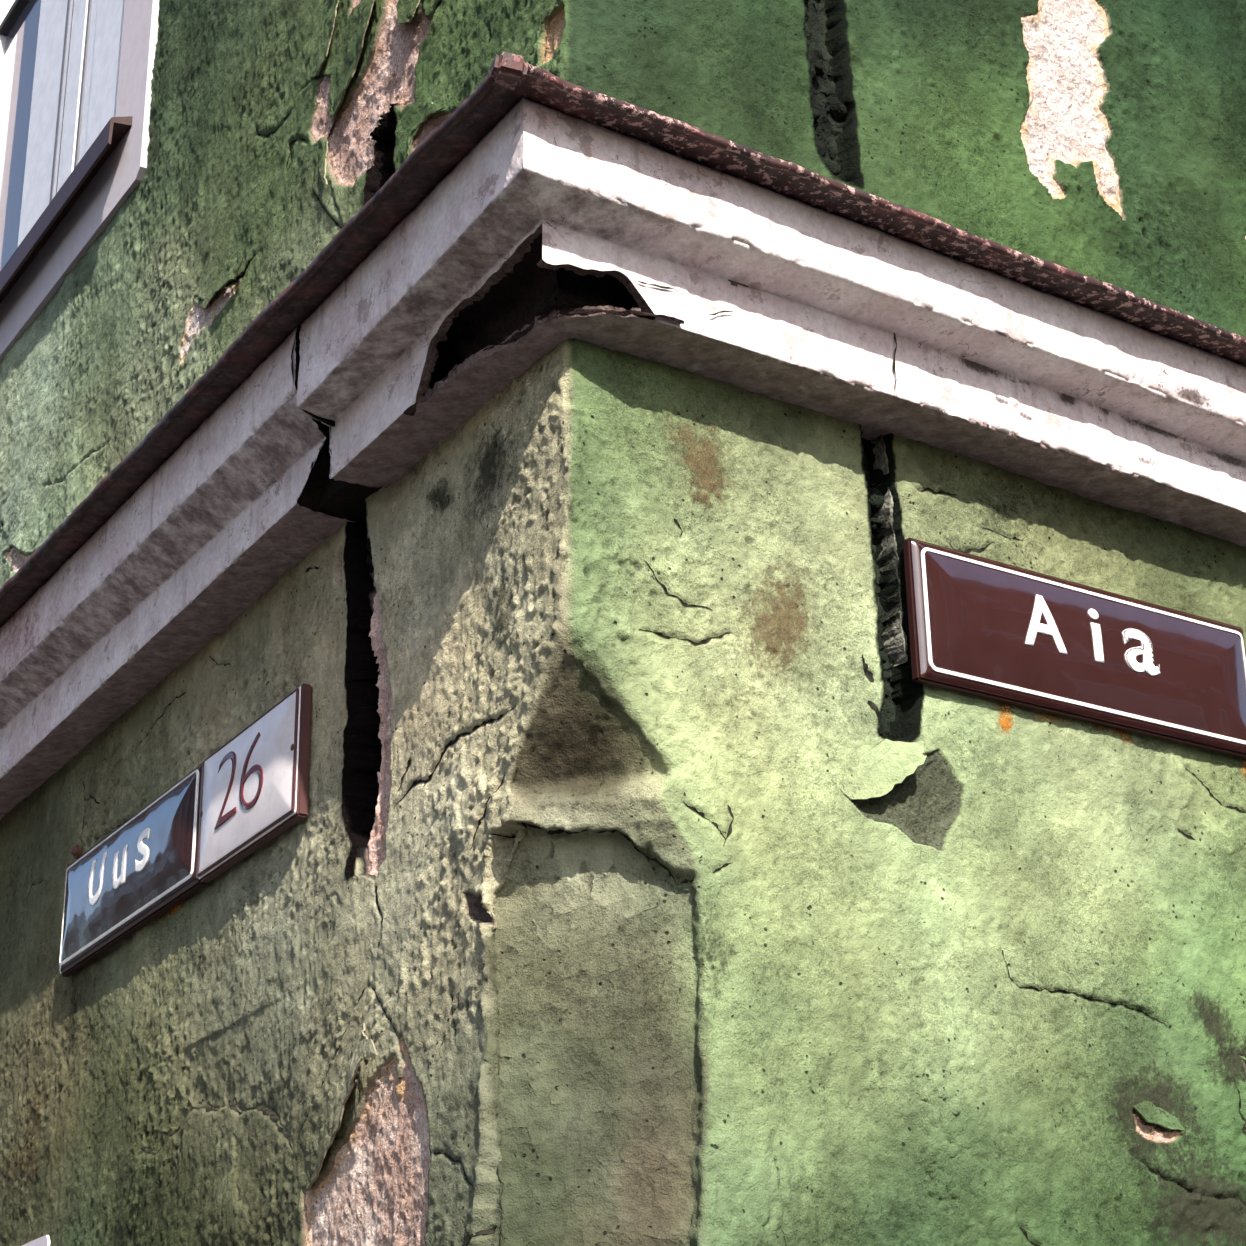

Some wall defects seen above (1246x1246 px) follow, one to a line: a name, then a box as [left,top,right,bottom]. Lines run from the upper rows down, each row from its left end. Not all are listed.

peeling [287,0,451,228]
crack [804,0,847,177]
peeling [1020,0,1123,220]
peeling [179,251,259,368]
spalling [423,233,685,396]
crack [862,435,956,739]
crack [949,526,1023,552]
crack [126,559,515,1165]
crack [1002,950,1169,1028]
spalling [301,1023,431,1246]